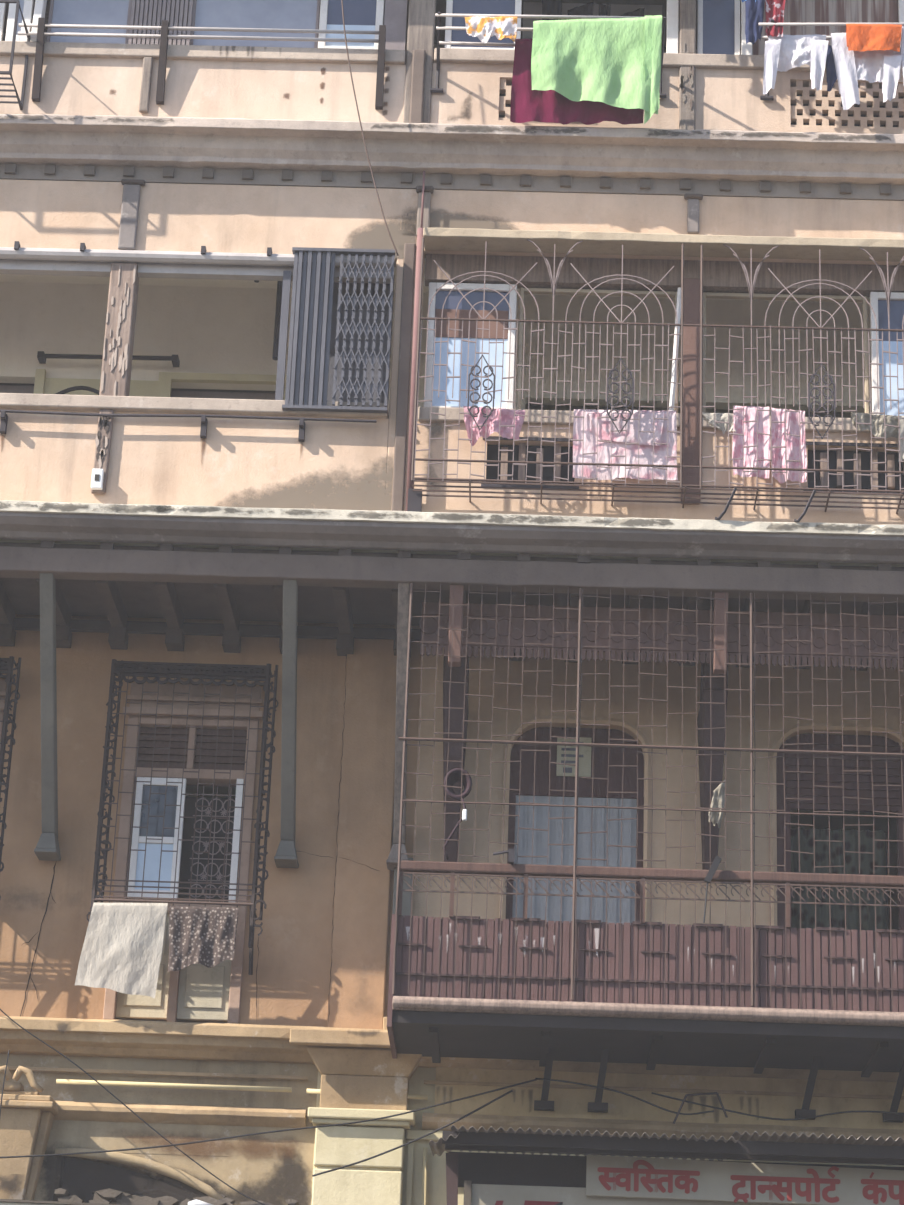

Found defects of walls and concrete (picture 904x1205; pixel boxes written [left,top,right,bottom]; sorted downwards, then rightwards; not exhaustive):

damp [350,210,512,258]
peeling [101,266,136,396]
damp [0,458,412,518]
damp [432,513,566,524]